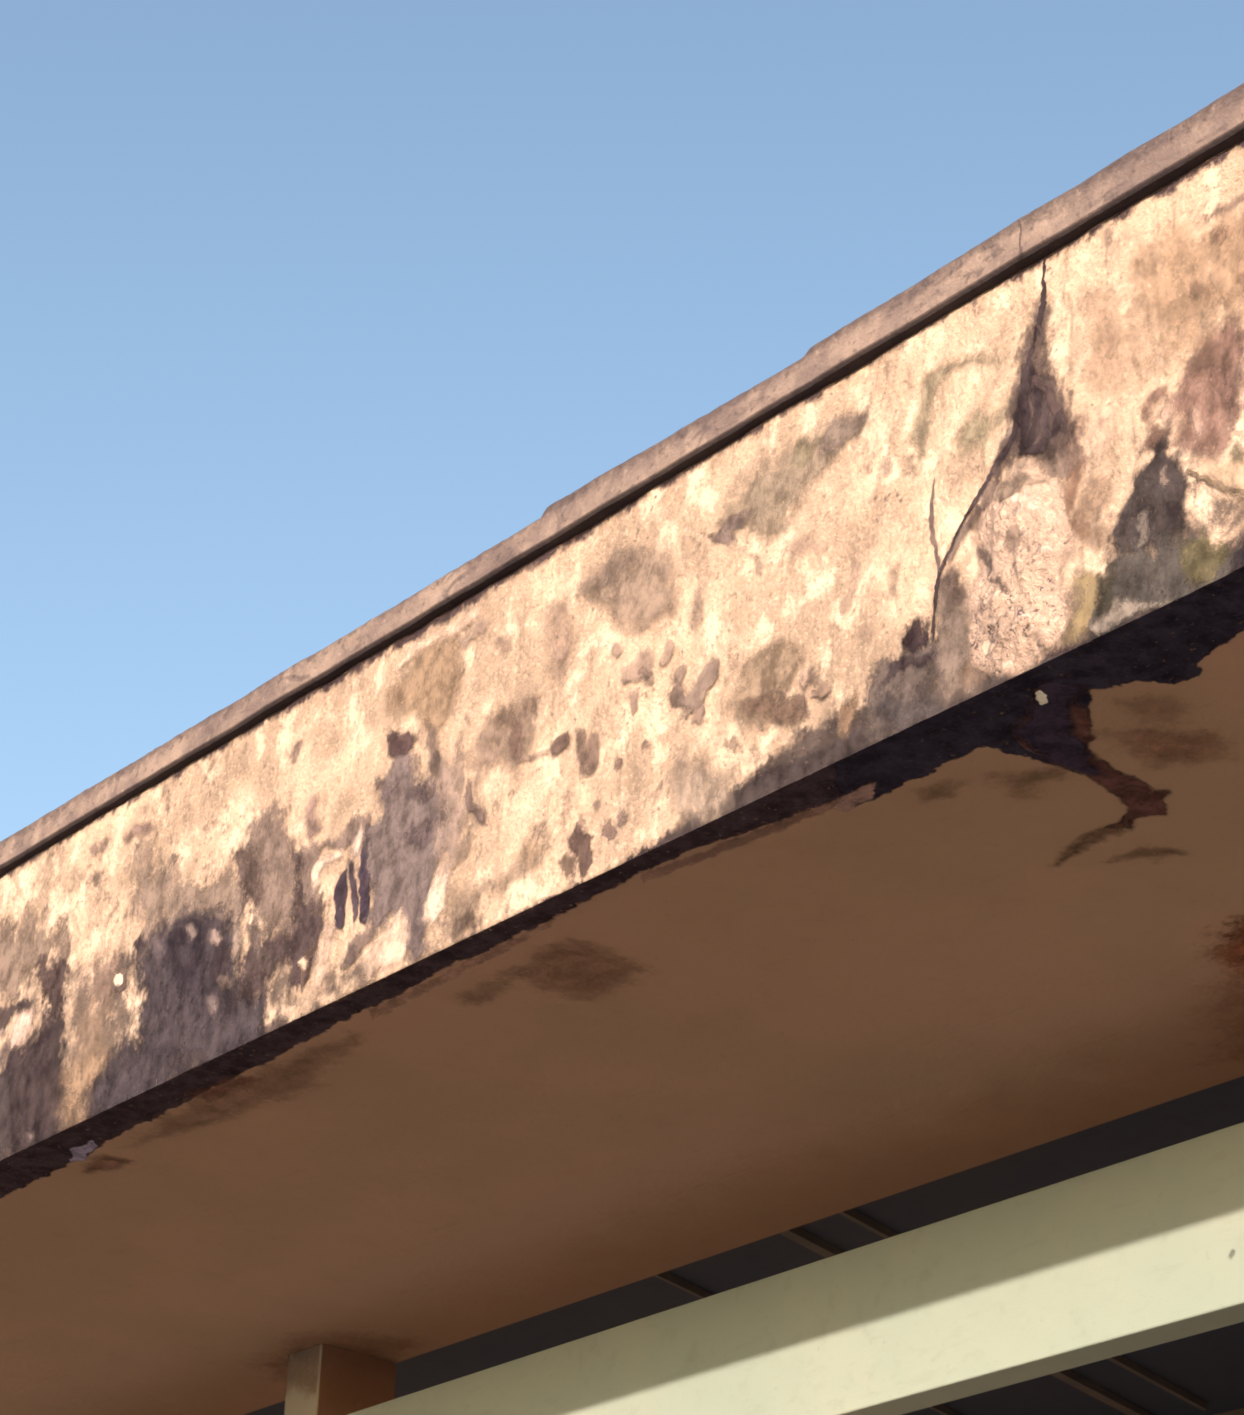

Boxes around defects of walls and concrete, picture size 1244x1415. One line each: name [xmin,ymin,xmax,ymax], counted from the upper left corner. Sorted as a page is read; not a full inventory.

leakage [999,140,1244,285]
leakage [1134,195,1244,349]
crack [928,218,1067,640]
spalling [999,424,1083,480]
leakage [0,294,1244,1198]